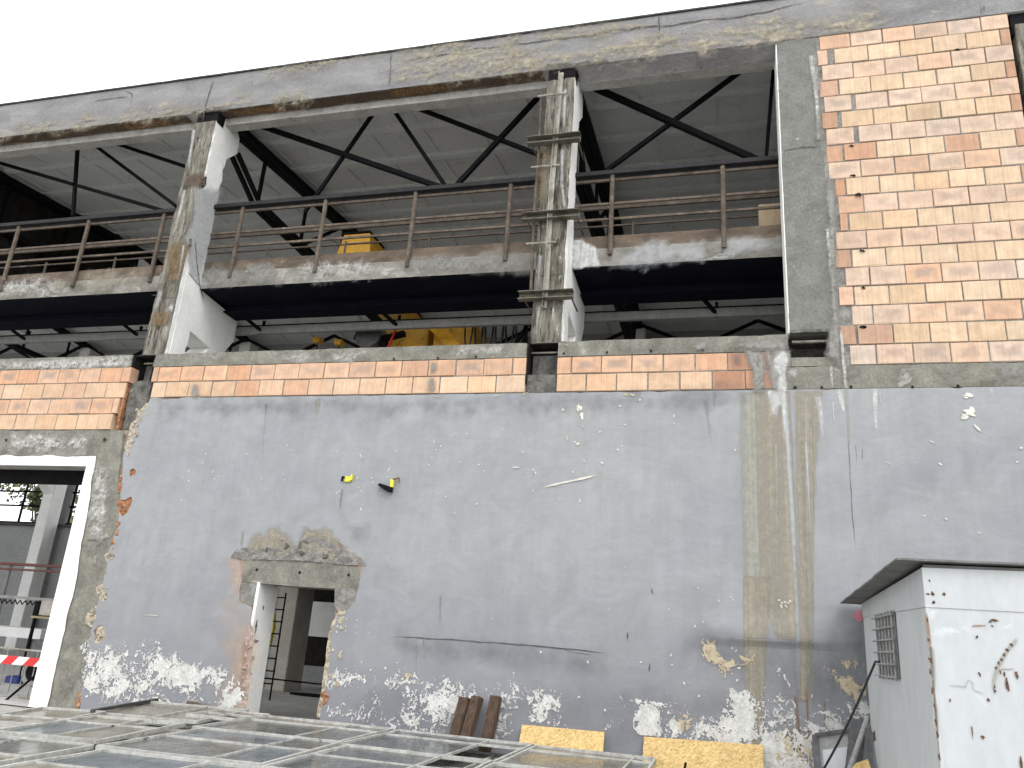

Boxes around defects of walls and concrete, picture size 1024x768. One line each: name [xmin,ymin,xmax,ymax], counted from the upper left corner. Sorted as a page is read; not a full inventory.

water stain [811,50,822,140]
rust [168,241,189,281]
spalling [125,403,148,456]
water stain [739,179,859,757]
spalling [104,469,136,561]
spalling [231,529,366,566]
peeling [317,610,568,740]
crack [394,636,601,655]
peeling [604,639,871,768]
rust [925,580,946,760]
rust [978,640,1019,701]